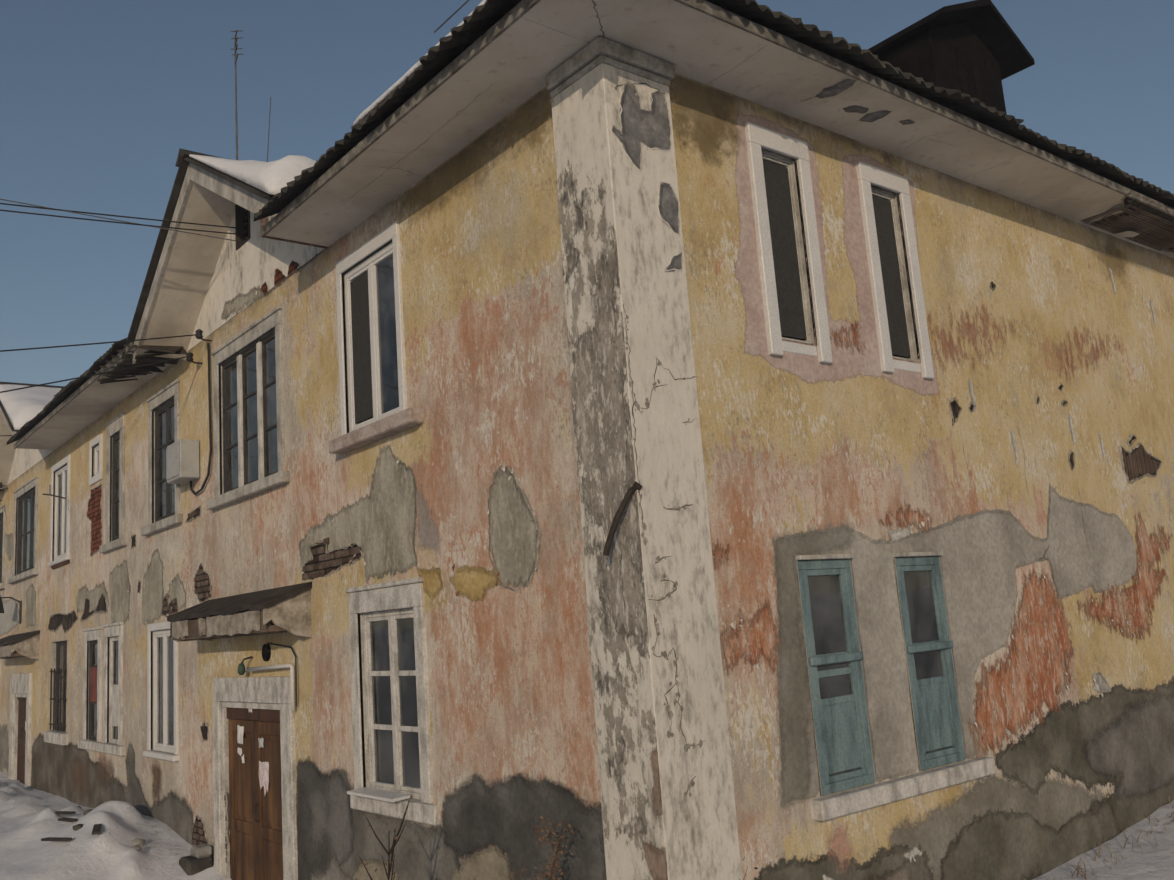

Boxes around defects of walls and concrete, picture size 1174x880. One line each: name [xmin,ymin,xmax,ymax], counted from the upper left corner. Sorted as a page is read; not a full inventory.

peeling [610,82,672,172]
peeling [657,181,684,272]
spalling [1081,191,1174,253]
spalling [1118,434,1162,484]
spalling [87,484,103,557]
peeling [299,445,542,602]
peeling [0,533,212,635]
peeling [720,485,1173,785]
leakage [0,723,9,773]
leakage [31,734,194,845]
leakage [296,760,607,880]
leakage [754,676,1174,880]